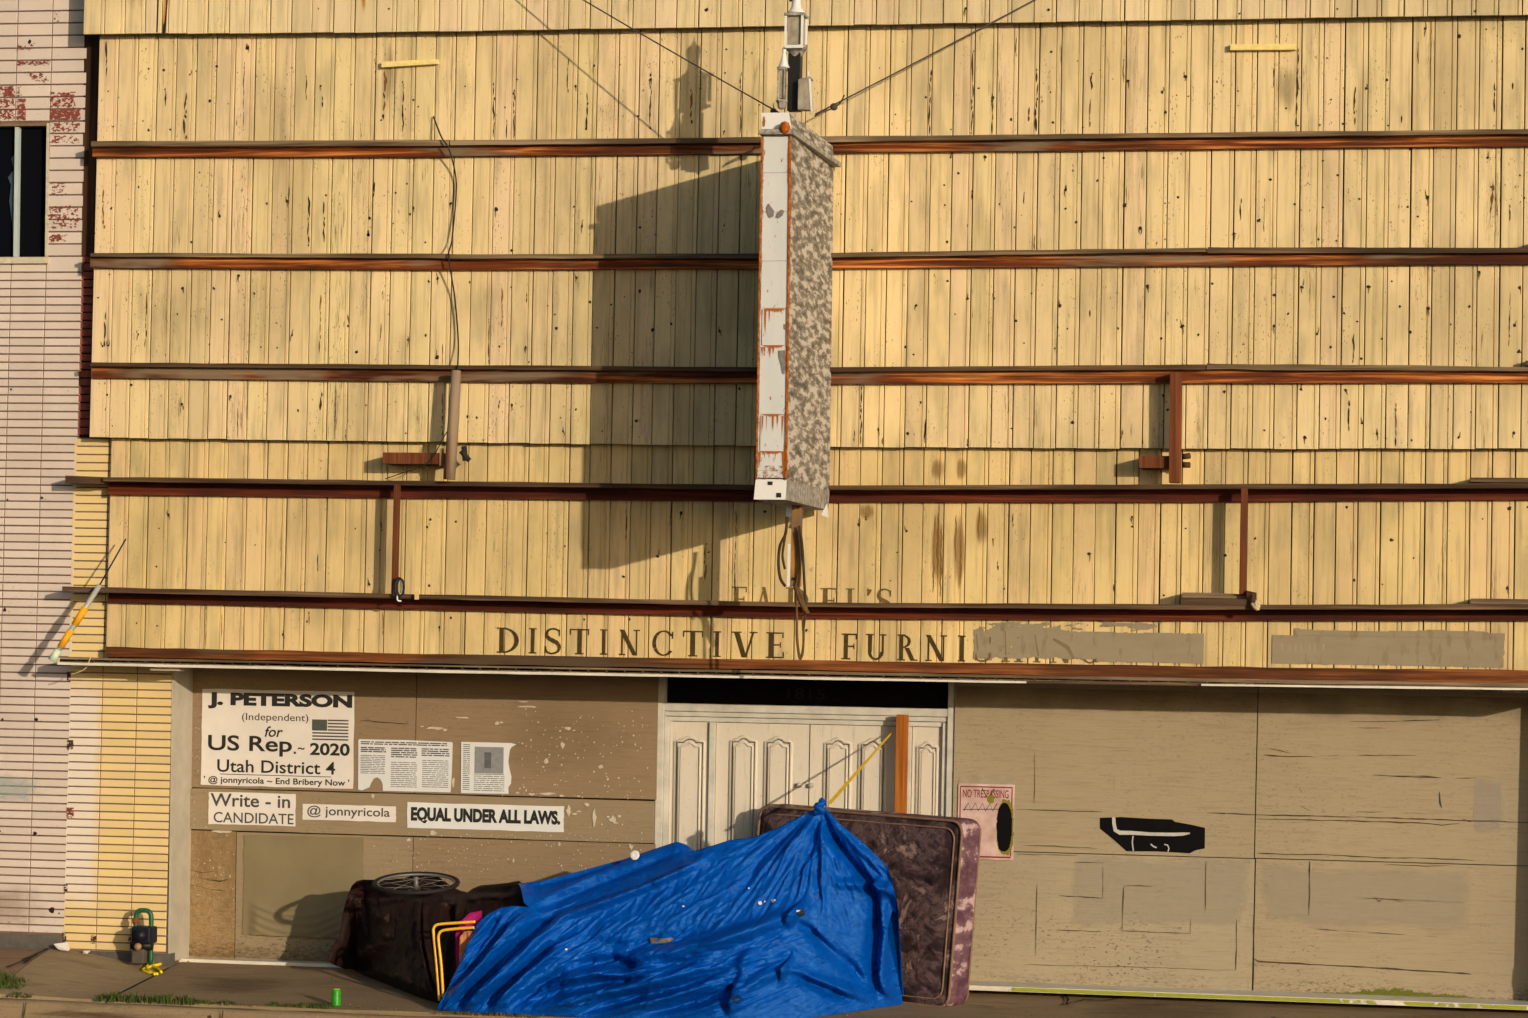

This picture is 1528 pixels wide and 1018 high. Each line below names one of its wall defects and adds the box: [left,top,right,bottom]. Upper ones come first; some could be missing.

peeling [0,39,81,144]
peeling [47,182,80,242]
rust [759,298,789,376]
rust [758,407,786,479]